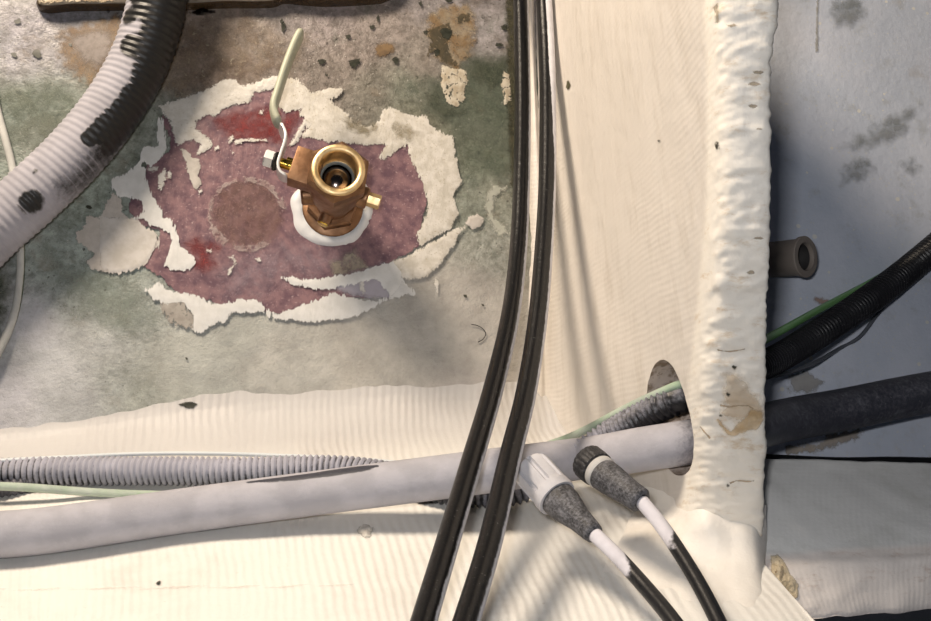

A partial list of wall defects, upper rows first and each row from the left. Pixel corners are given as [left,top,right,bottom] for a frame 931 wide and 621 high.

corrosion [426,5,476,70]
water stain [834,0,860,23]
peeling [434,49,469,107]
corrosion [718,375,763,436]